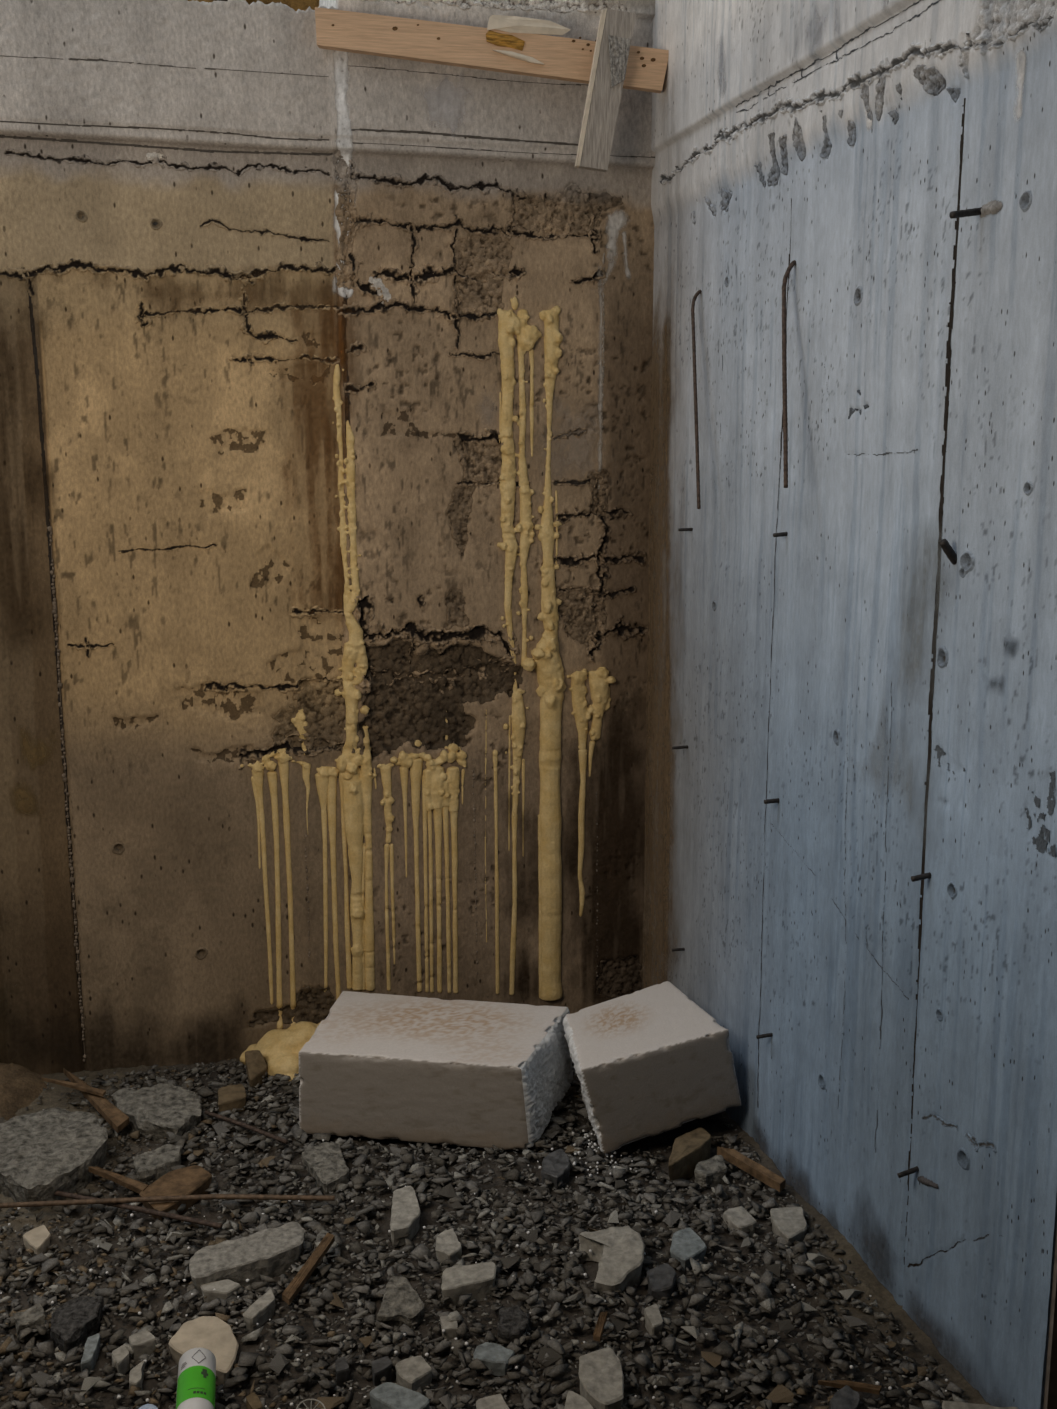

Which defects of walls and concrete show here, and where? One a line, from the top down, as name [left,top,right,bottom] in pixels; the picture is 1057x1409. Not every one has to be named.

spalling [1019,190,1032,212]
crack [0,148,606,396]
damp [0,339,32,636]
spalling [270,617,344,683]
spalling [181,685,260,721]
spalling [112,715,159,730]
spalling [190,745,257,764]